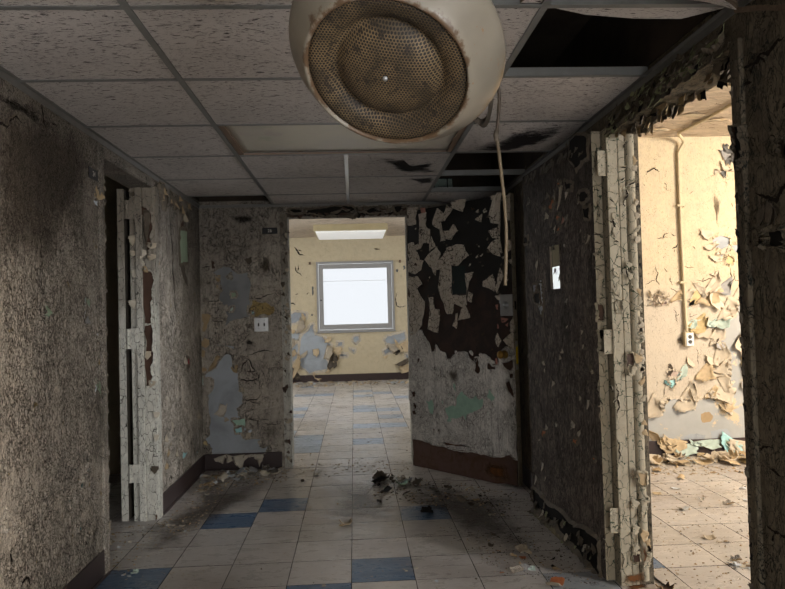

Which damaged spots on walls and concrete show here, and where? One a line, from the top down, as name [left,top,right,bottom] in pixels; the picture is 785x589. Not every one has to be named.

peeling [604,20,750,179]
peeling [523,131,601,248]
peeling [128,180,192,388]
peeling [202,341,271,468]
peeling [247,192,518,460]
peeling [527,262,634,442]
peeling [624,224,749,570]
peeling [509,544,536,574]
peeling [527,458,602,578]